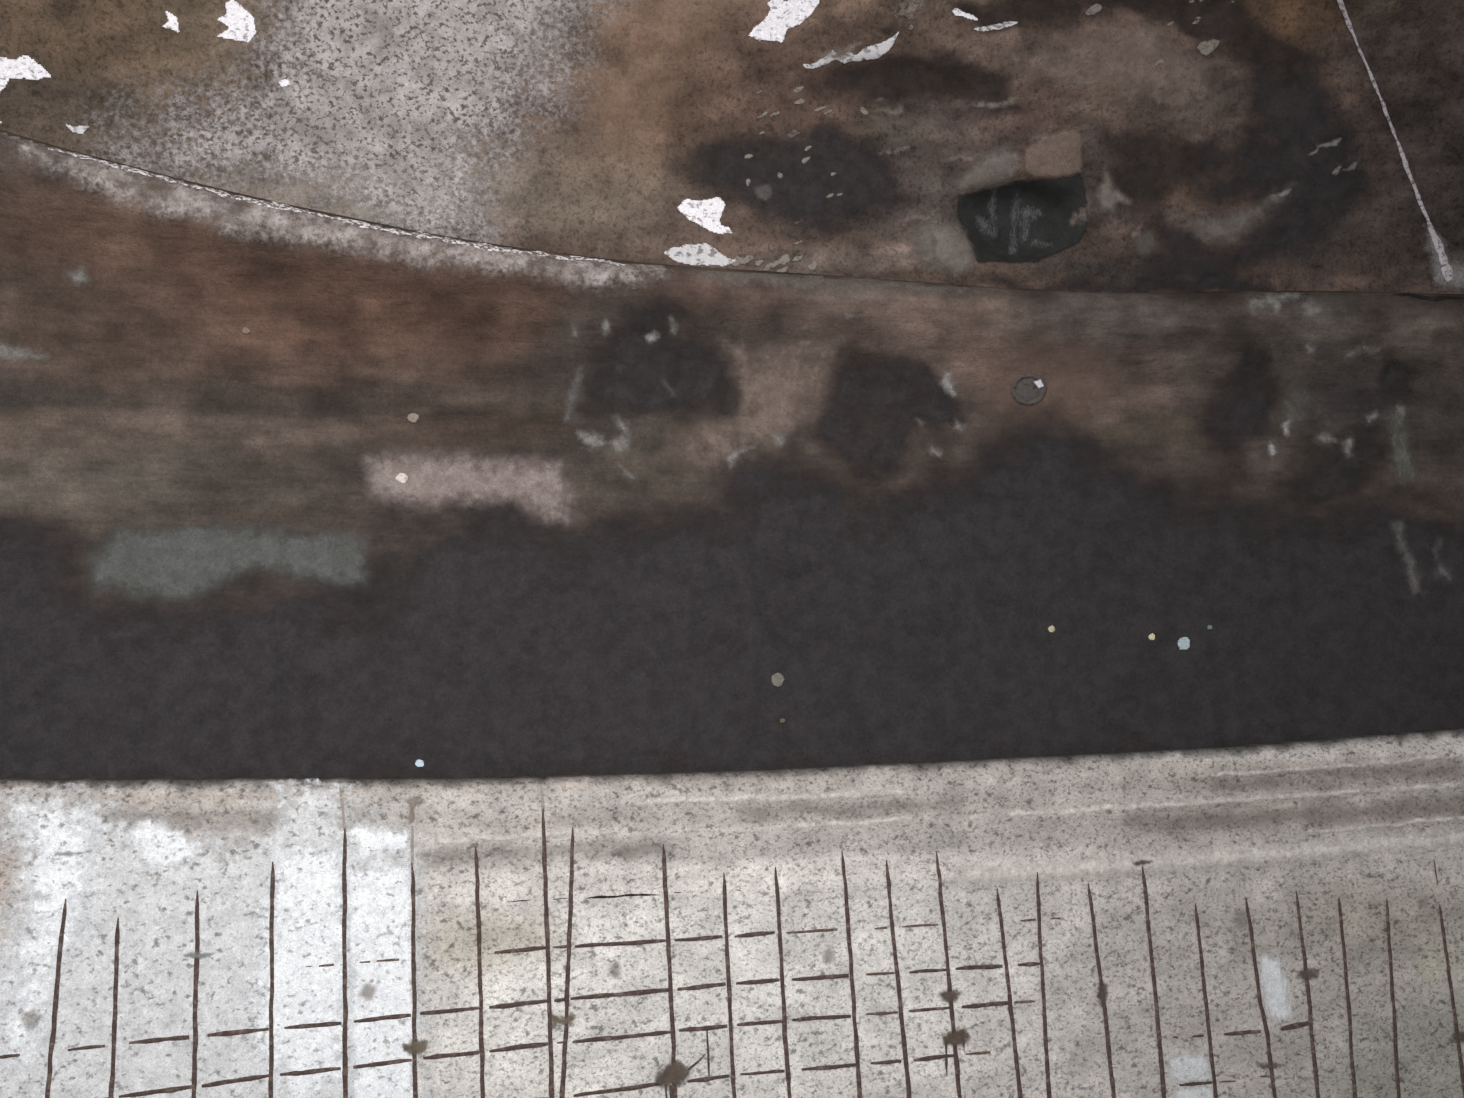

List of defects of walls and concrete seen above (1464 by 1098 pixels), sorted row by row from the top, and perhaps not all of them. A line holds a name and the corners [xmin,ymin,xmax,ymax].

peeling [749,0,819,43]
peeling [803,0,923,69]
peeling [952,8,1018,32]
peeling [0,55,51,94]
crack [1337,0,1464,301]
peeling [664,197,817,272]
leakage [1250,292,1319,316]
leakage [943,373,953,393]
leakage [565,368,627,452]
leakage [1368,407,1415,481]
crack [511,892,682,902]
corrosion [656,1053,706,1098]